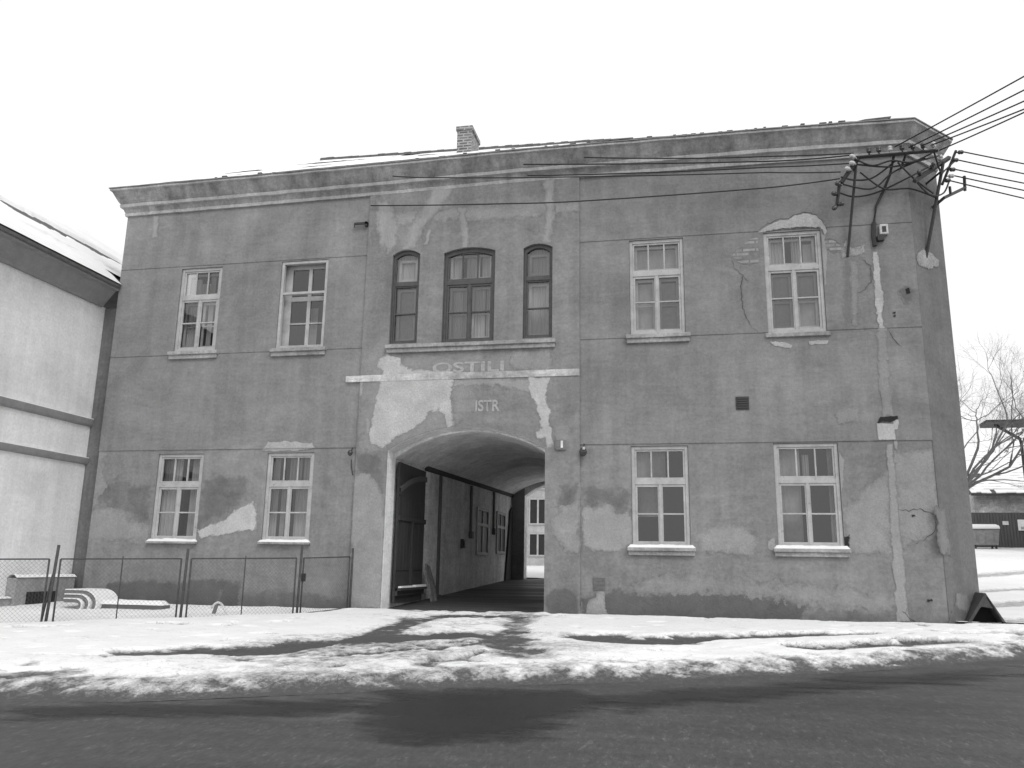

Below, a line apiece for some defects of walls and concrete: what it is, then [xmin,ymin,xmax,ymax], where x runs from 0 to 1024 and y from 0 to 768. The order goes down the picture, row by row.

flaking render [916,248,940,270]
peeling [353,351,516,461]
peeling [527,377,573,448]
peeling [197,501,258,539]